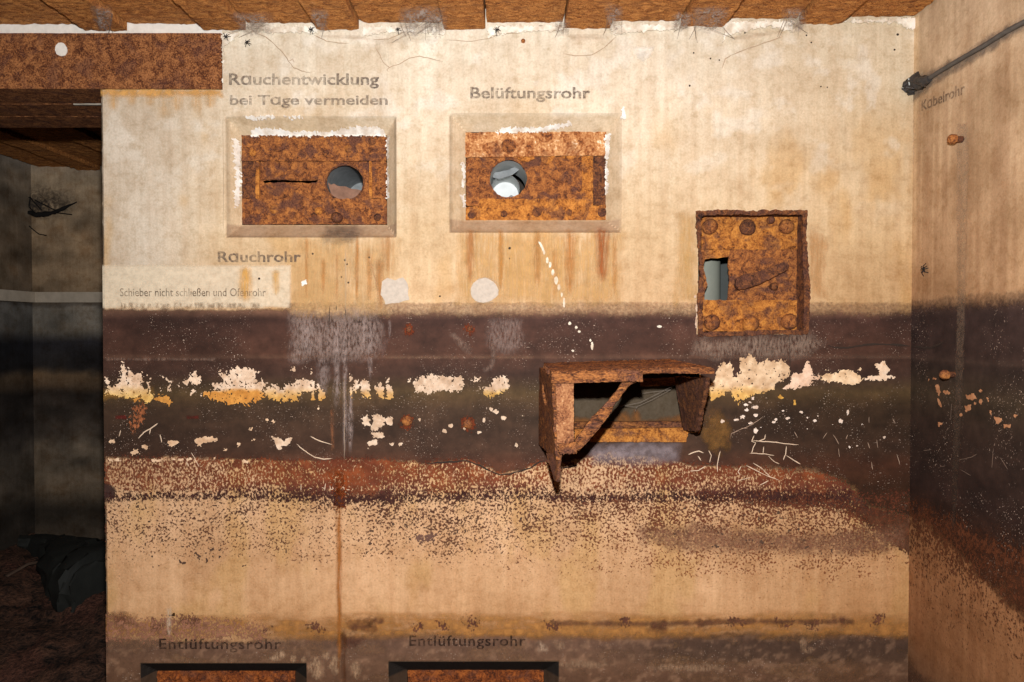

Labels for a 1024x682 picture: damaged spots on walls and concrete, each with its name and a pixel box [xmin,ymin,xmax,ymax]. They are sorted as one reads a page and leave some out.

corrosion [464,231,617,300]
damp [103,297,1024,616]
corrosion [104,449,1024,664]
peeling [959,389,1017,428]